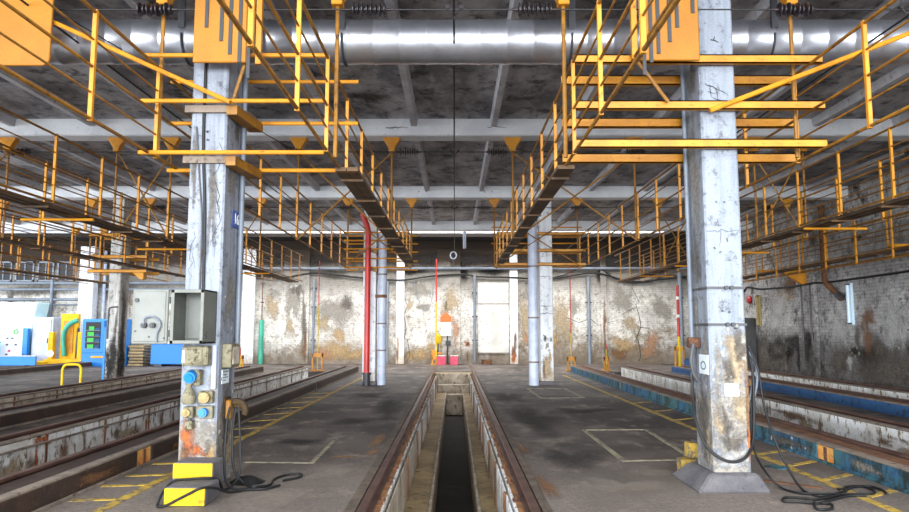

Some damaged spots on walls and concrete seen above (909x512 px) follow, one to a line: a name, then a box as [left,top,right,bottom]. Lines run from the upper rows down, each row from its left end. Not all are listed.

water stain [301,294,362,359]
water stain [396,337,434,360]
crack [538,285,649,361]
water stain [768,339,810,371]
water stain [832,303,909,374]
corrosion [160,412,207,459]